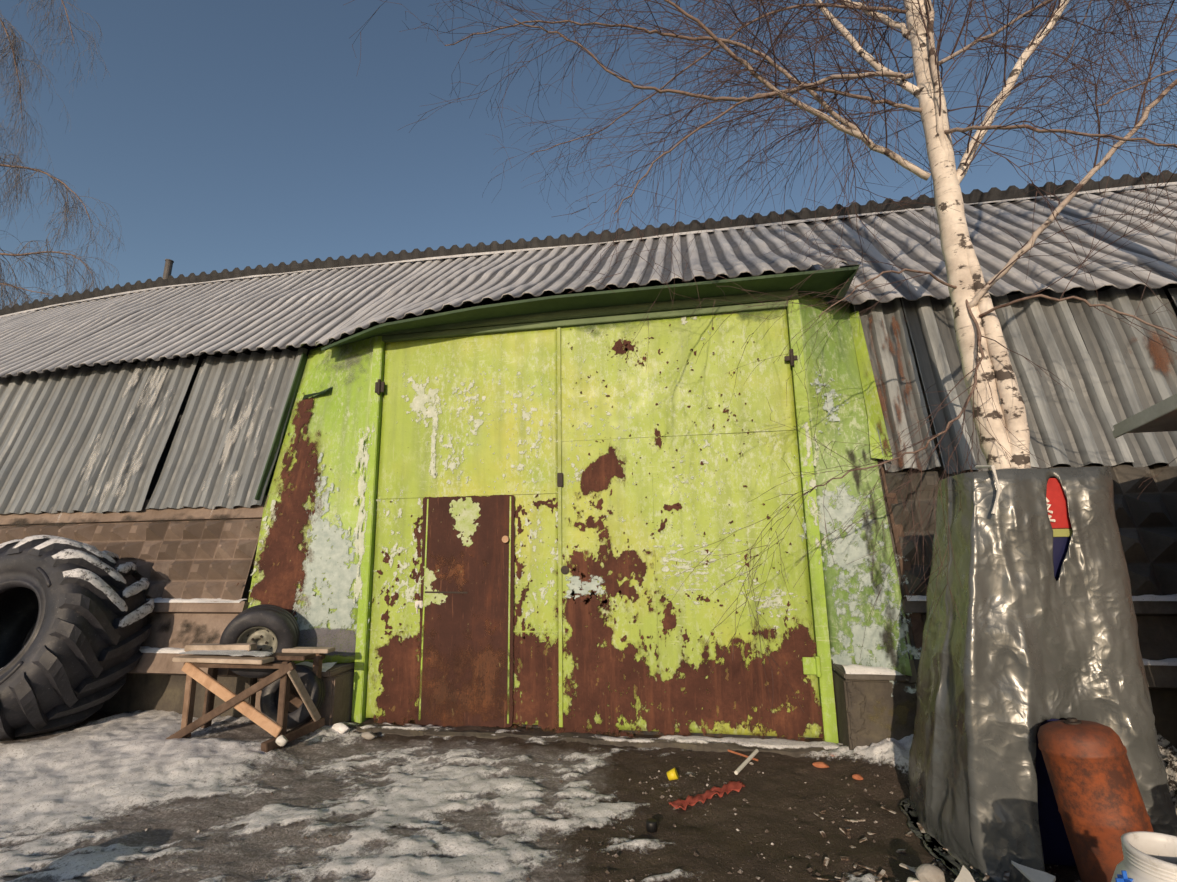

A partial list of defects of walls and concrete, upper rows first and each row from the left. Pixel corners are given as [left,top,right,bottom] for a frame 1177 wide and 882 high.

rust [249,392,331,619]
peeling [292,416,447,657]
peeling [401,365,655,547]
peeling [515,508,605,619]
rust [371,403,836,741]
rust [592,327,715,388]
peeling [640,521,797,629]
peeling [794,371,922,697]